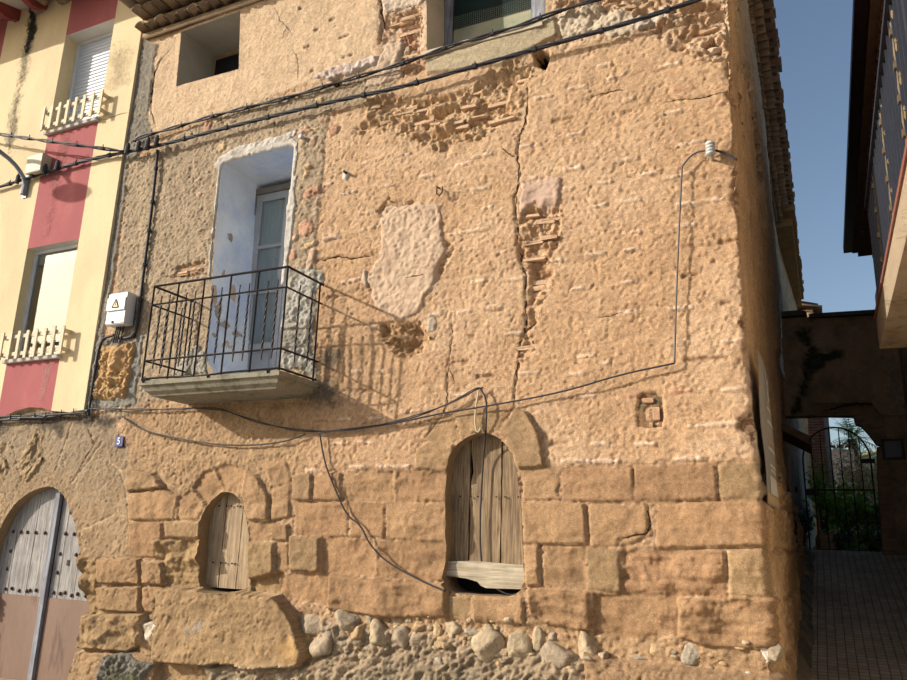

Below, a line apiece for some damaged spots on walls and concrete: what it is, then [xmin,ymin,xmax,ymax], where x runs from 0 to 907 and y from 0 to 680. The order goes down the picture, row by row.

water stain [19,9,37,79]
crack [150,66,159,125]
spalling [314,0,549,154]
flaking render [361,199,456,359]
crack [503,82,535,411]
spalling [515,176,565,366]
crack [419,331,454,447]
crack [618,504,651,546]